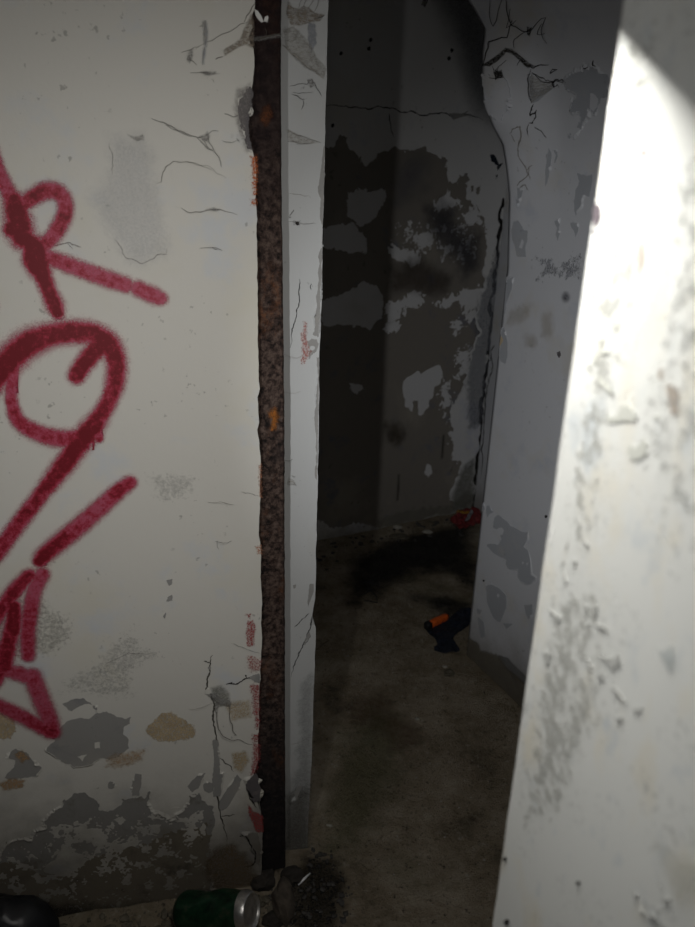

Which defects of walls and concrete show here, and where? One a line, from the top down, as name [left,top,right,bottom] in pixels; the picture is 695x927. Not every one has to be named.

crack [328,105,483,137]
peeling [527,61,609,140]
peeling [307,134,490,529]
crack [472,105,546,507]
peeling [482,502,537,586]
peeling [44,698,131,769]
peeling [146,712,195,741]
crack [205,644,260,867]
peeling [0,739,264,912]